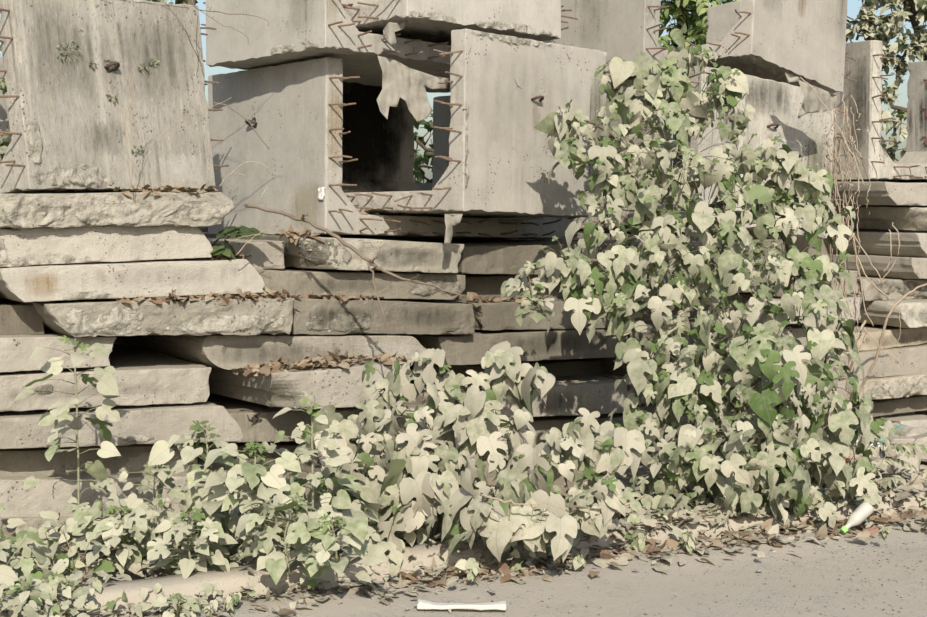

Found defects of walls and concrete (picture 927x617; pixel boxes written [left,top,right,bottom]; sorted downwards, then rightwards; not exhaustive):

spalling [0,120,152,228]